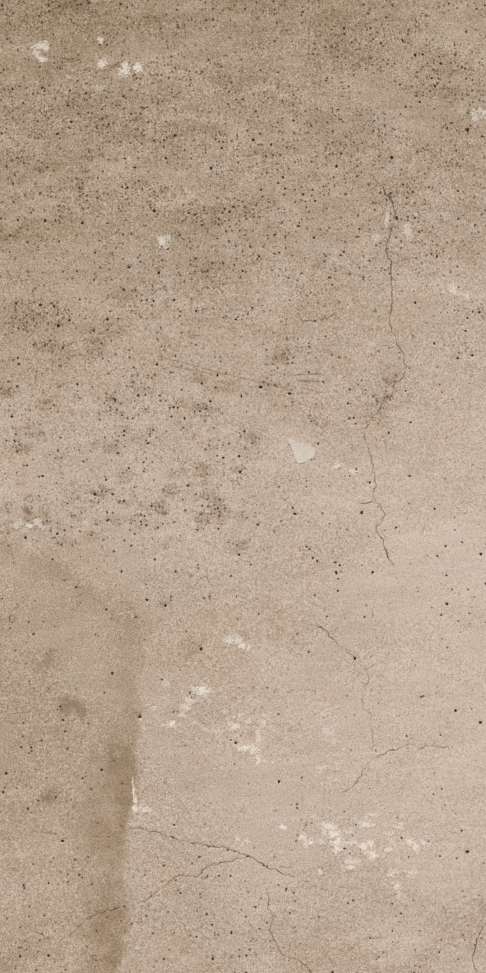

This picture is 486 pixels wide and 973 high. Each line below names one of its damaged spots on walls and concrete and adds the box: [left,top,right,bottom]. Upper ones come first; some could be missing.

crack [360,176,407,565]
crack [33,827,295,941]